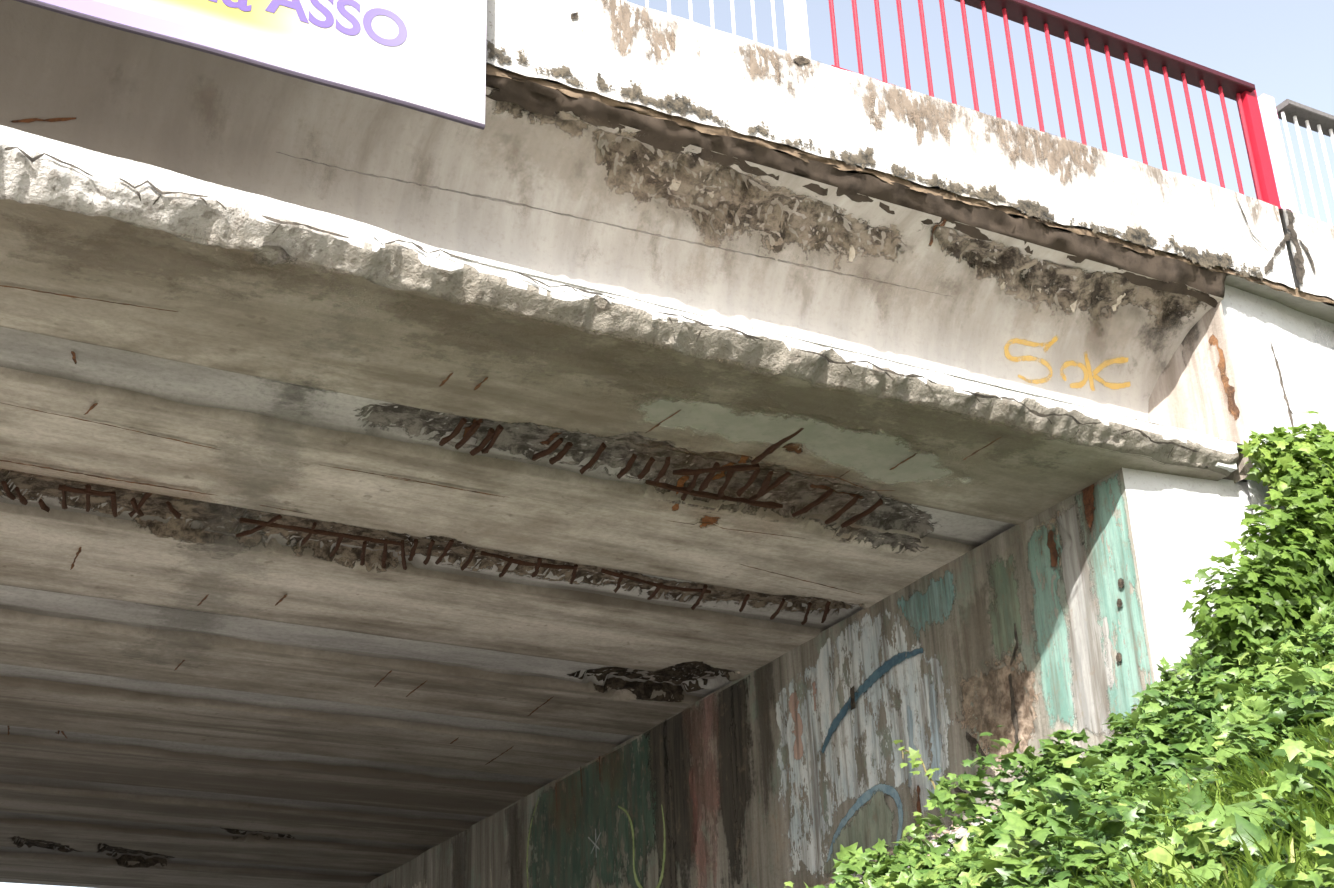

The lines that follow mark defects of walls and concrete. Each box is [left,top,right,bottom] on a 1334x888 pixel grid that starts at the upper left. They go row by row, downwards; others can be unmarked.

spalling [488,88,913,269]
peeling [854,81,955,145]
peeling [989,119,1097,184]
spalling [919,225,1207,336]
spalling [353,403,936,554]
peeling [0,468,1075,888]
peeling [1074,473,1152,729]
leakage [643,708,697,888]
leakage [716,675,753,888]